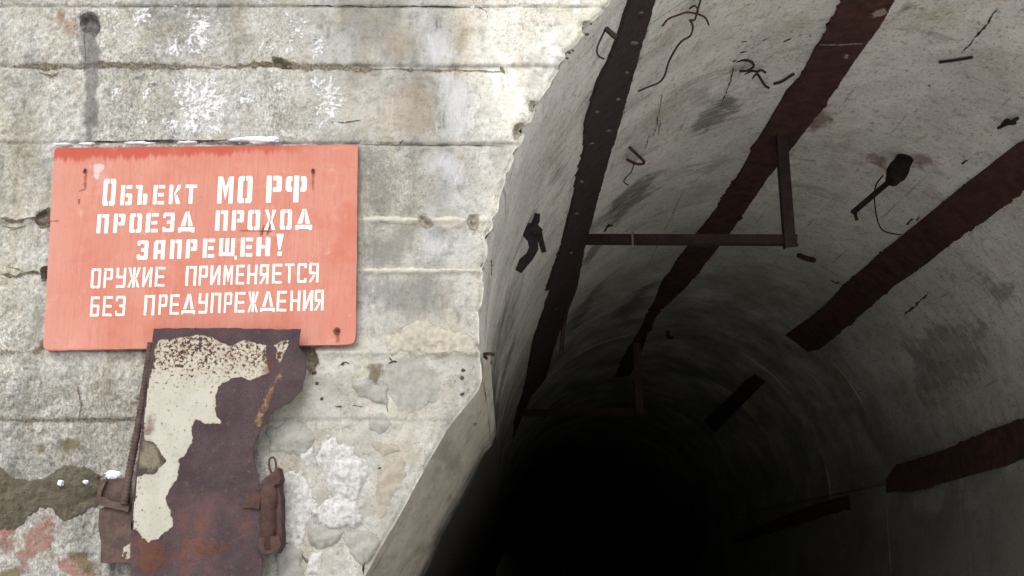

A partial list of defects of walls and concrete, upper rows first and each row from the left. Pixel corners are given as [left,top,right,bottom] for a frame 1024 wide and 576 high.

leakage [79,29,124,140]
efflorescence [136,1,259,147]
corrosion [255,369,284,427]
flaking render [352,377,399,469]